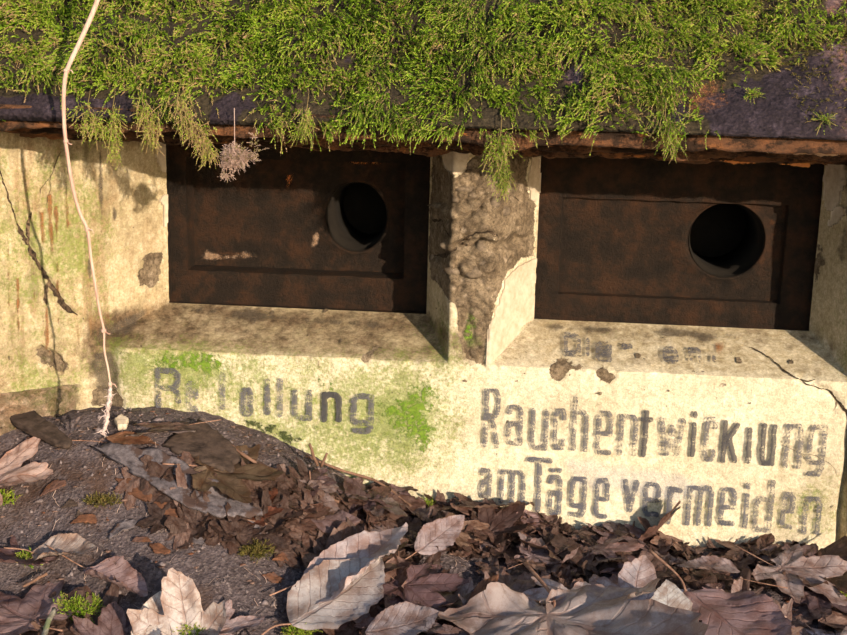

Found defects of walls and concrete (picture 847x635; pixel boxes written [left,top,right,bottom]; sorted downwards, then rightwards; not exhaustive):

crack [0,152,77,315]
spalling [138,252,163,288]
spalling [427,152,541,365]
spalling [36,347,69,372]
crack [749,347,847,414]